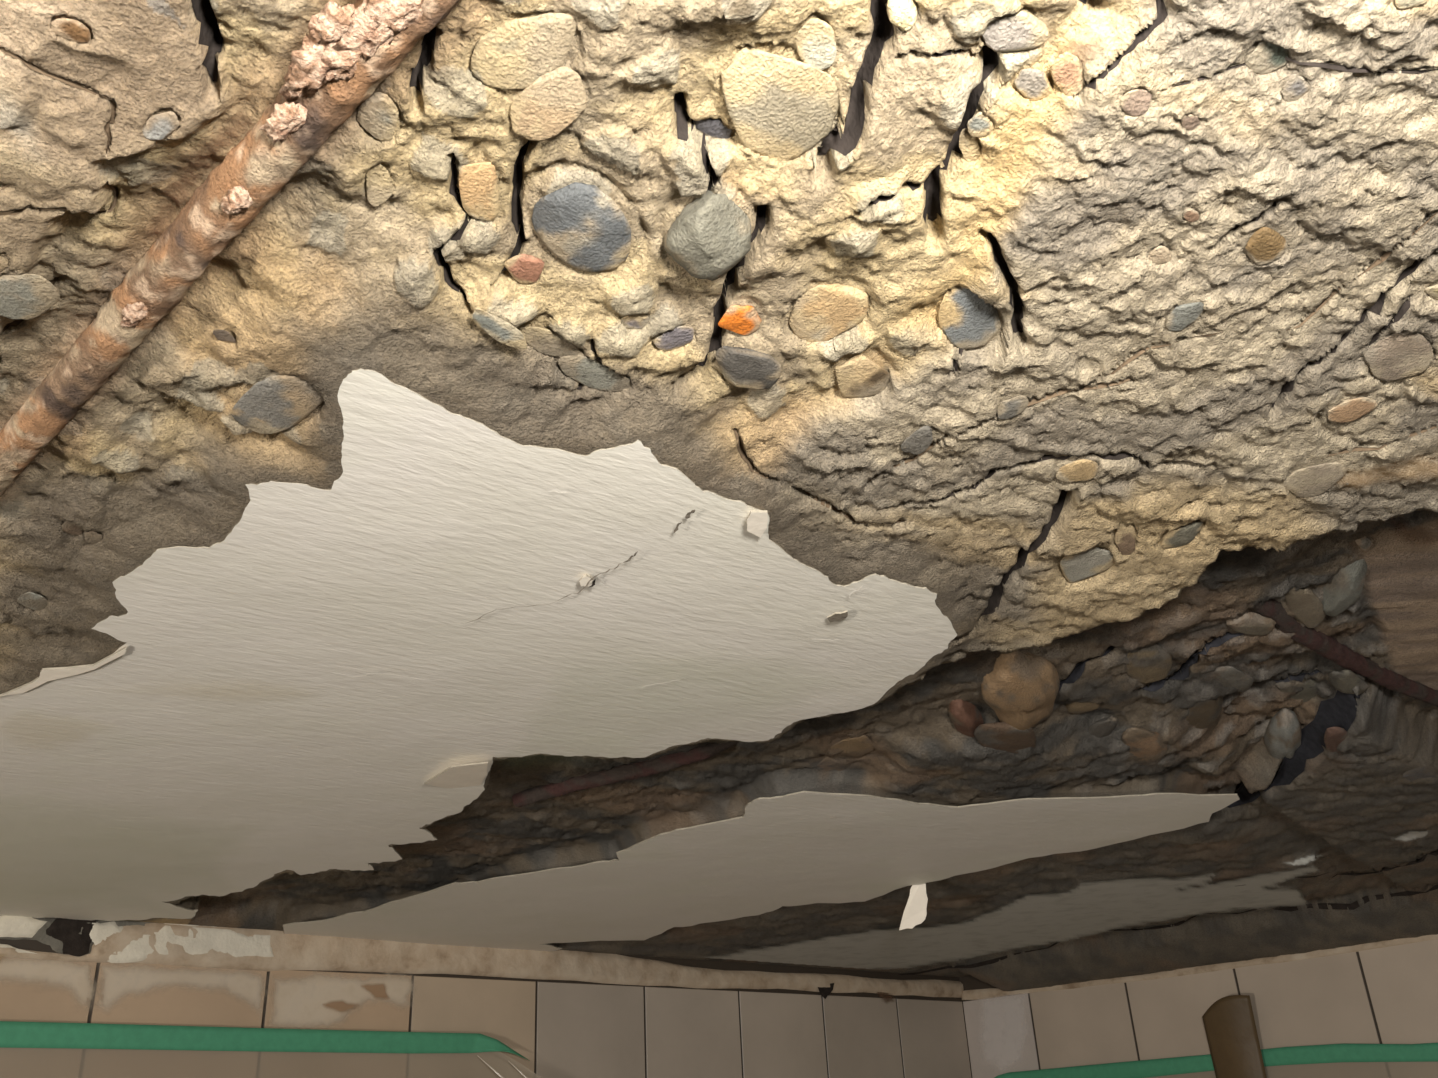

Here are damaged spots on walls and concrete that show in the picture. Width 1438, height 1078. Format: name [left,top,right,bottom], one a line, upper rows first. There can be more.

crack [191,0,223,82]
crack [433,153,472,304]
crack [502,140,530,271]
crack [674,92,721,191]
spalling [0,0,1438,697]
crack [694,205,767,367]
crack [817,0,894,156]
crack [870,45,998,223]
crack [987,232,1024,333]
crack [1271,211,1438,407]
spalling [0,635,1022,963]
spalling [549,510,1438,991]